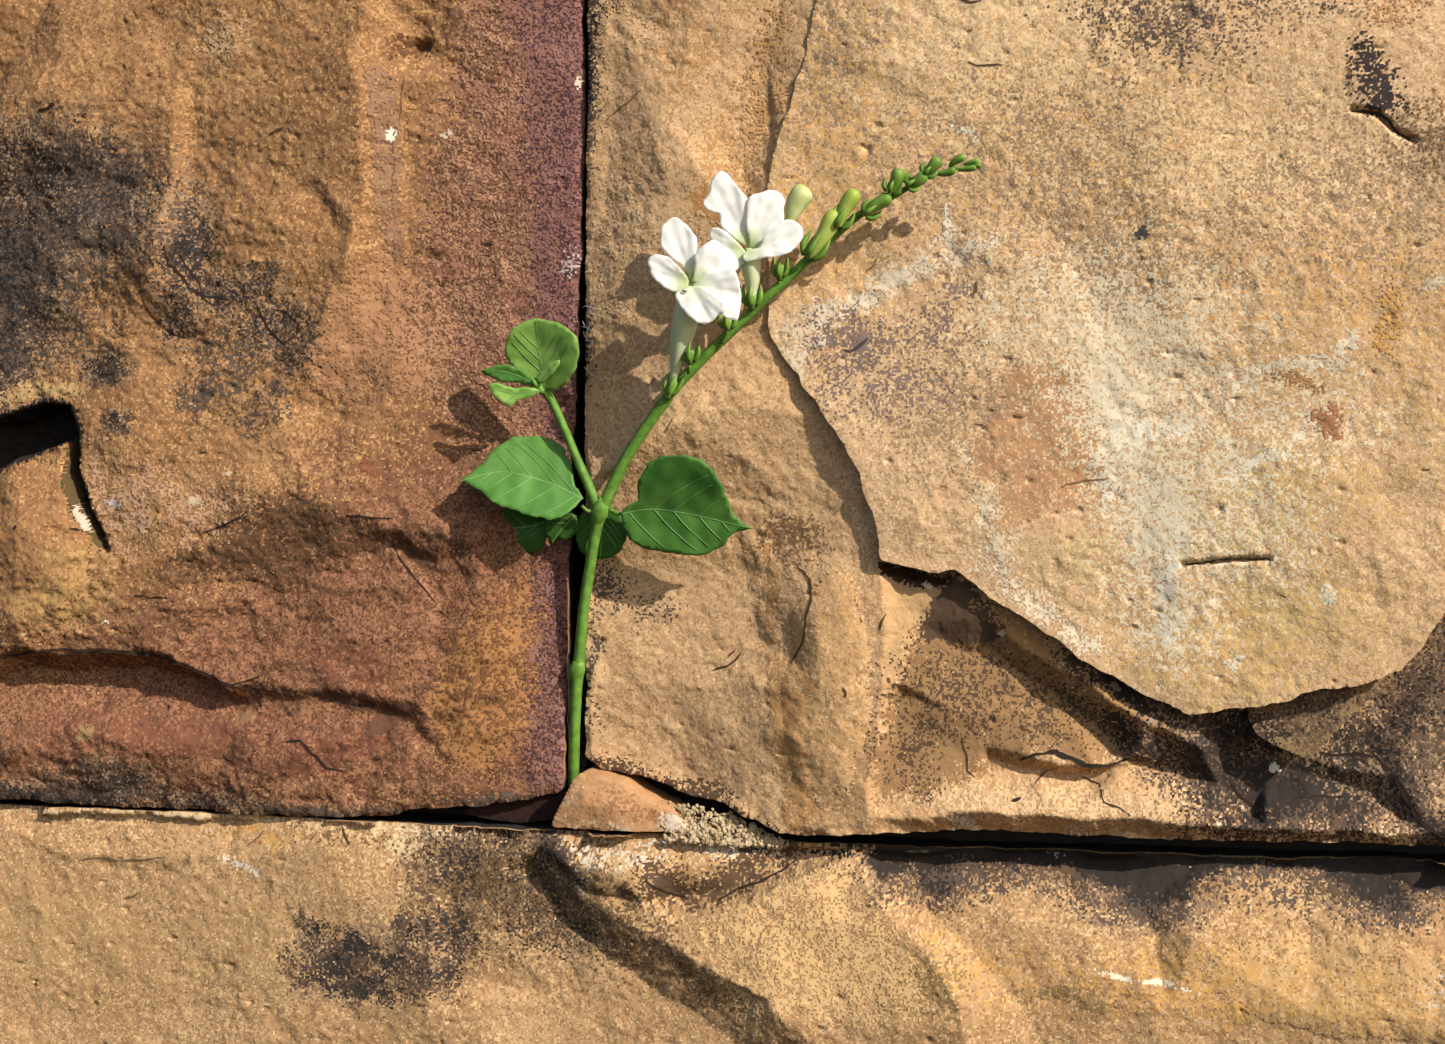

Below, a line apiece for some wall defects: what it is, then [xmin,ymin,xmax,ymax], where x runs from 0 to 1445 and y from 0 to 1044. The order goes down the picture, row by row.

leakage [559,0,669,387]
leakage [0,72,488,594]
spalling [0,379,87,408]
peeling [768,0,1445,831]
spalling [72,505,93,531]
leakage [753,514,836,567]
crack [791,563,812,663]
leakage [0,559,1445,1031]
crack [1011,749,1130,816]
spalling [1347,824,1414,844]